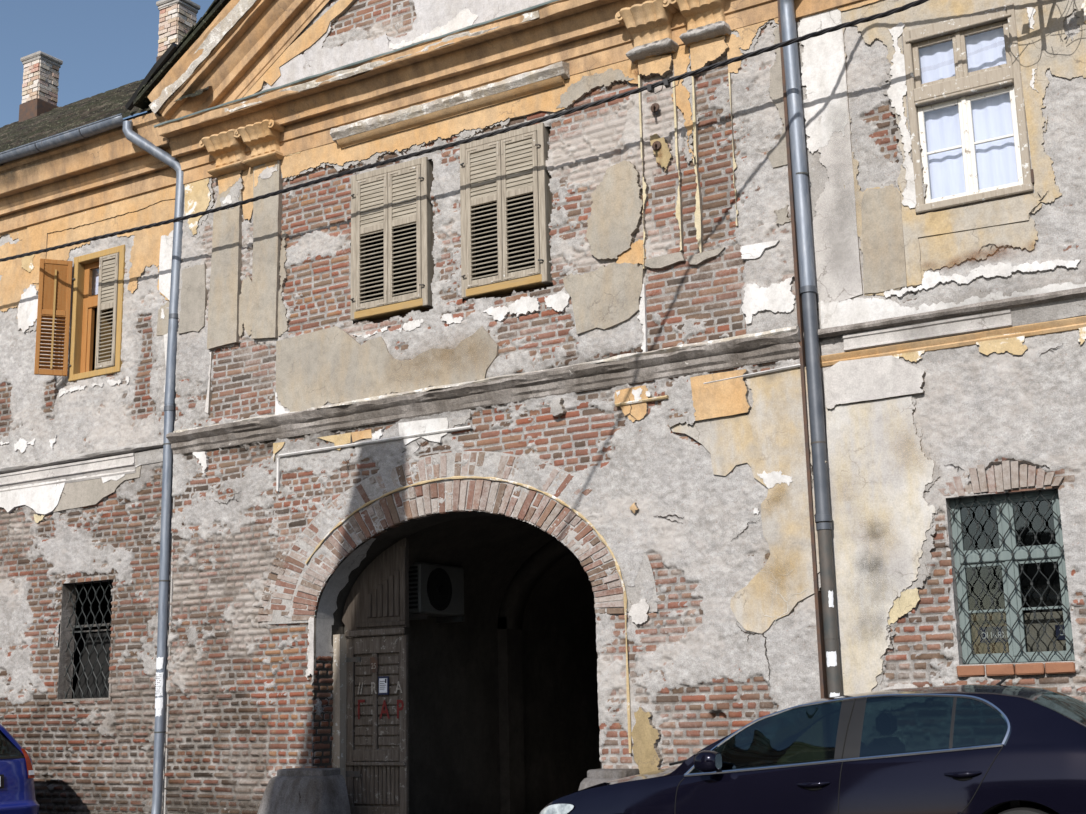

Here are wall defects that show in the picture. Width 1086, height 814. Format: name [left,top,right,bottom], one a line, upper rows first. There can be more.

peeling [242,0,550,98]
peeling [796,0,1086,329]
peeling [0,18,796,423]
peeling [976,332,1028,356]
spalling [0,380,36,453]
peeling [0,464,142,523]
peeling [193,452,209,475]
peeling [318,428,386,451]
spalling [234,538,376,775]
spalling [629,563,704,653]
spalling [1069,593,1086,697]
spalling [632,674,779,769]